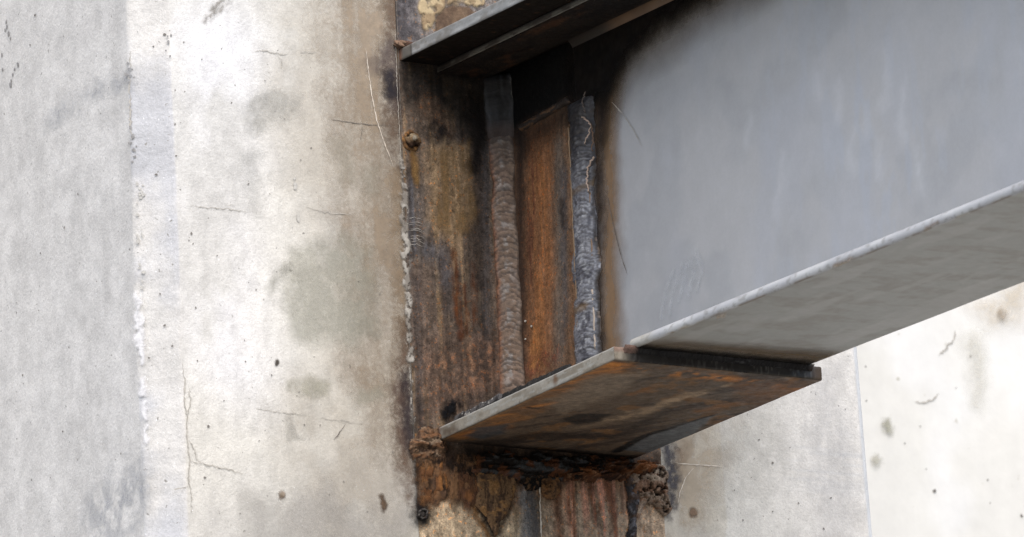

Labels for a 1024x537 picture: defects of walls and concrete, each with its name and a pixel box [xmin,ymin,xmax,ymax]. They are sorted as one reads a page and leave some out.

water stain [338,0,417,503]
crack [174,364,242,512]
rust [409,426,712,537]